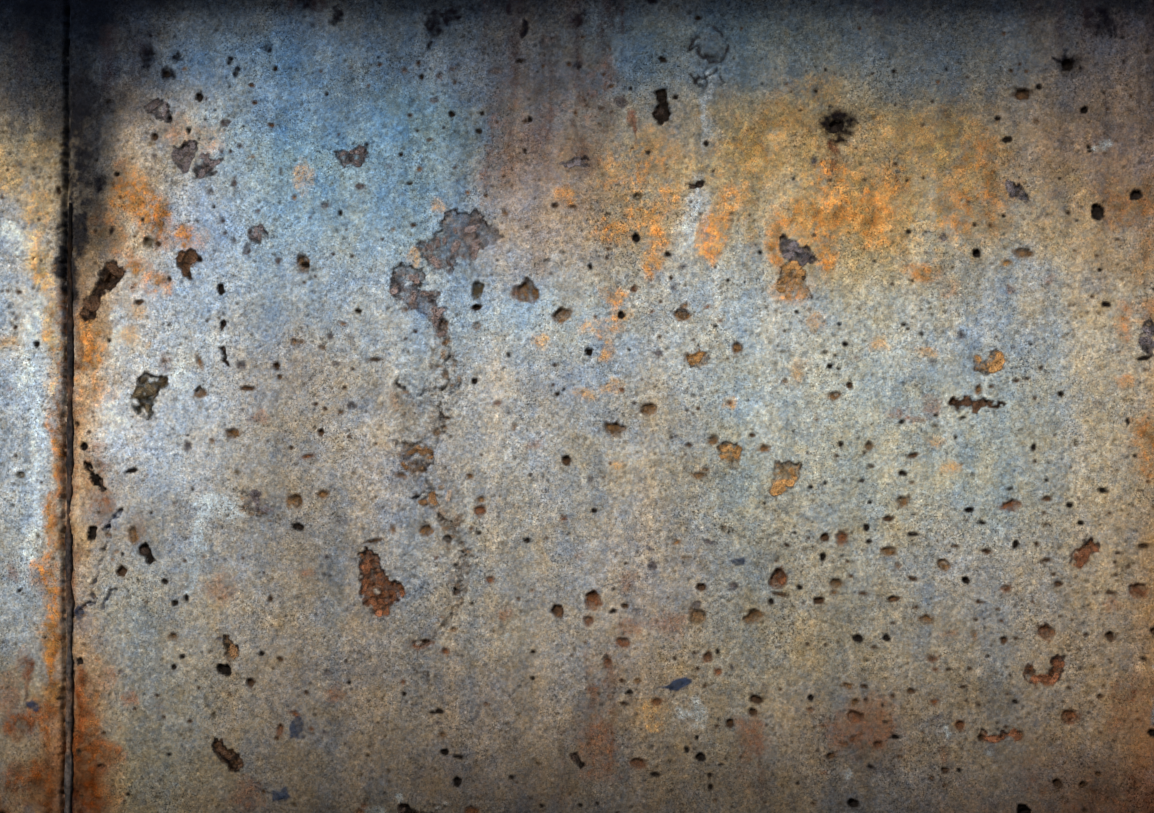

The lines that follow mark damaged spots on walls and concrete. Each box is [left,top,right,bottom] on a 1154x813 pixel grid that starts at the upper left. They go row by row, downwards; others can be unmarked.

spalling [80,260,124,322]
rust [94,172,192,252]
rust [124,261,170,292]
peeling [389,207,498,393]
rust [700,188,738,259]
spalling [776,234,816,300]
rust [767,143,898,271]
spalling [132,373,168,420]
crack [436,338,456,432]
rust [3,400,111,742]
spalling [358,526,405,617]
crack [413,457,478,677]